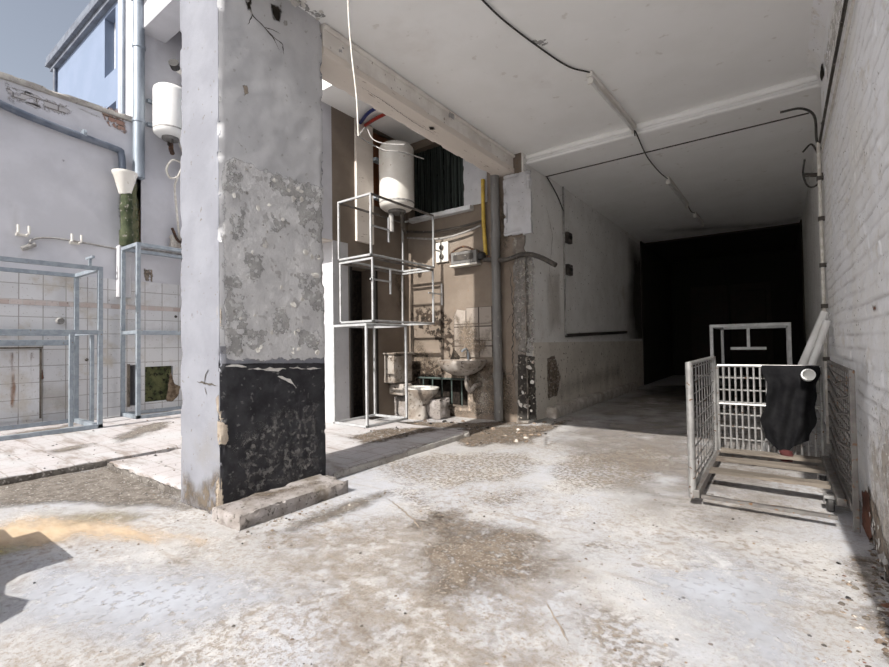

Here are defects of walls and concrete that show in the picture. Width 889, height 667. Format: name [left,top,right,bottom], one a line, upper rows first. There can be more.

crack [248,9,284,53]
peeling [6,87,70,114]
flaking render [102,107,126,134]
peeling [214,158,325,386]
peeling [517,354,537,421]
spalling [547,355,561,398]
spalling [216,395,229,445]
spalling [215,477,224,506]